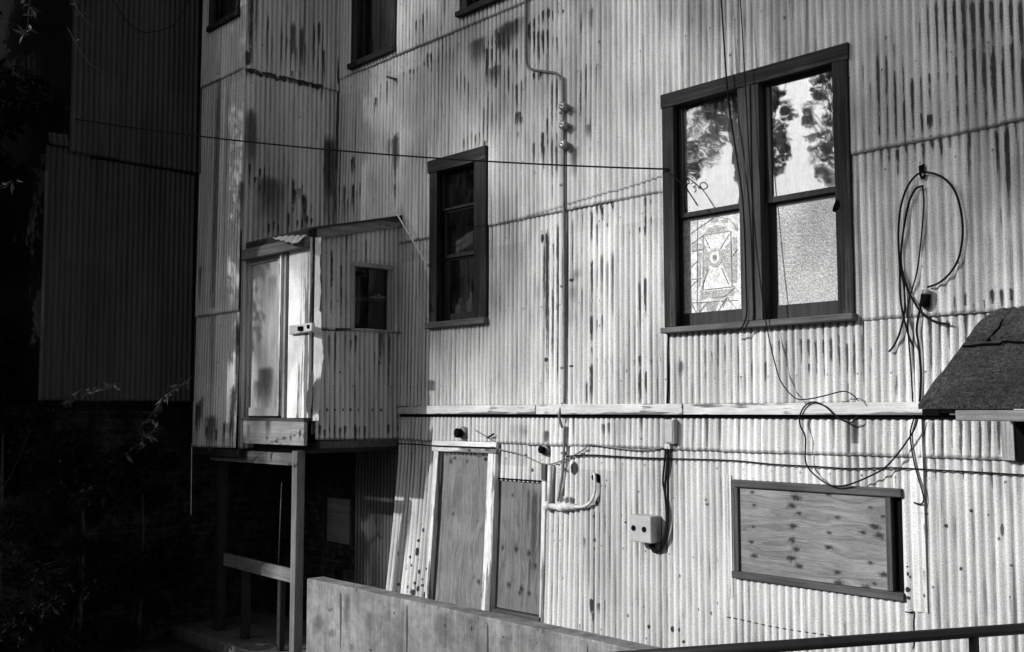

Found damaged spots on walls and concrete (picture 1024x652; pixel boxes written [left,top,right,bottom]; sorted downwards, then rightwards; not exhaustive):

leakage [247,112,255,159]
rust [268,179,312,236]
rust [245,0,361,224]
leakage [324,139,334,206]
rust [463,8,564,174]
rust [580,65,602,113]
rust [862,56,971,175]
rust [927,0,1024,121]
rust [994,121,1017,222]
rust [541,202,613,372]
rust [639,277,647,311]
rust [634,355,652,402]